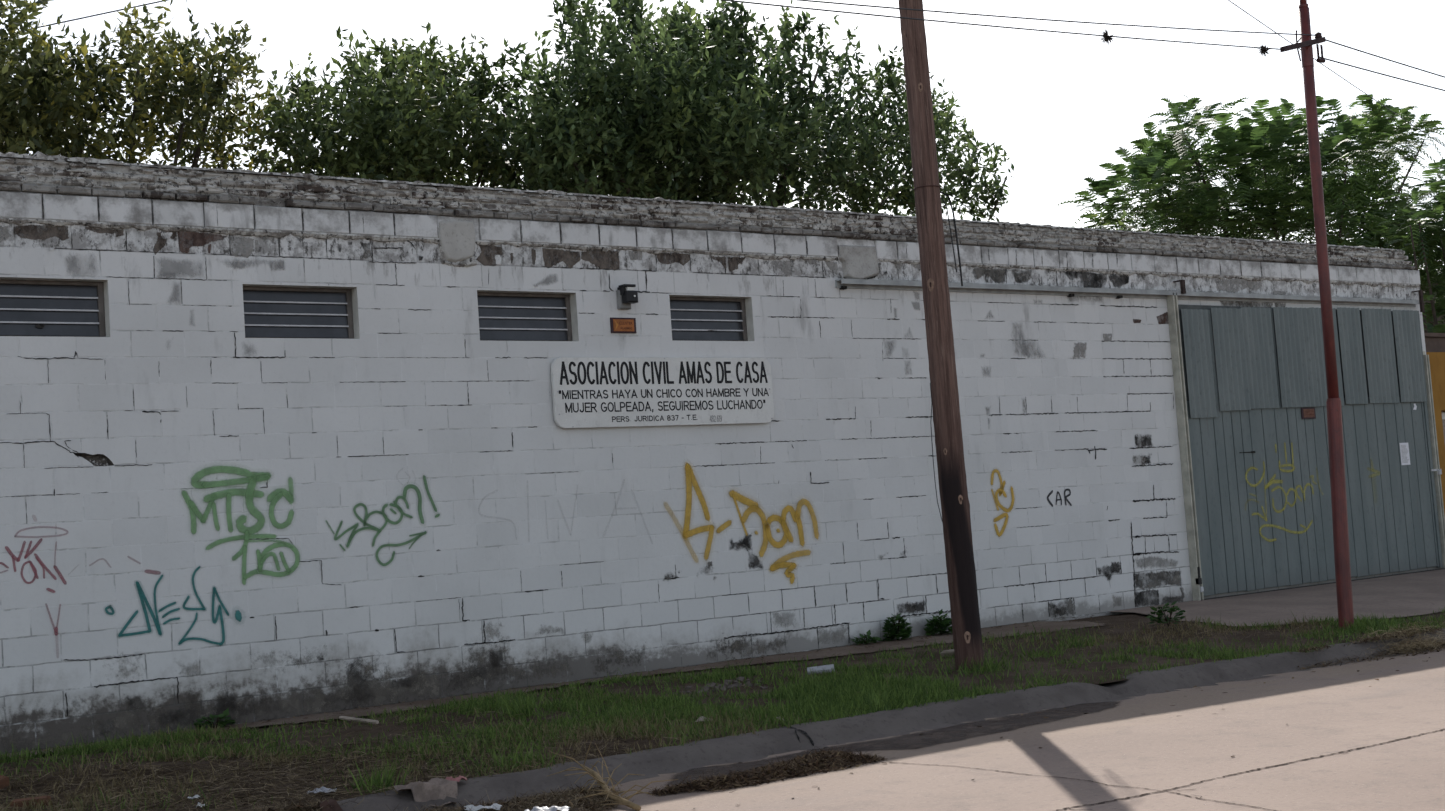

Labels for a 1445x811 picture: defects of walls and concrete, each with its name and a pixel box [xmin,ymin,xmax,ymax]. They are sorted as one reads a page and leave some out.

peeling [0,225,69,251]
peeling [85,227,124,246]
peeling [153,231,274,258]
peeling [438,243,513,268]
peeling [531,248,690,270]
peeling [710,256,746,271]
peeling [1065,271,1129,288]
crack [0,351,88,469]
water stain [895,601,925,617]
water stain [95,627,573,736]